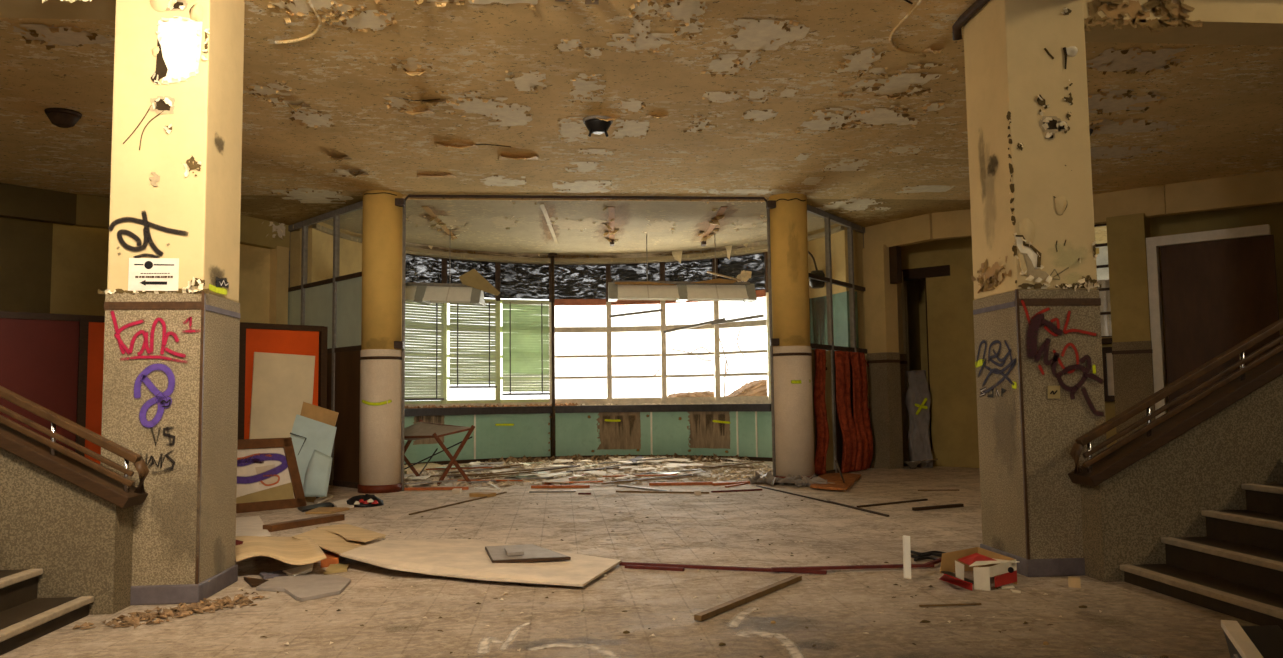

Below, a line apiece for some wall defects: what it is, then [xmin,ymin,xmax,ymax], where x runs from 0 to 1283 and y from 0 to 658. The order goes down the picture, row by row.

peeling [267,0,538,33]
peeling [1061,0,1203,32]
peeling [150,0,210,134]
peeling [382,70,547,129]
peeling [552,0,708,194]
peeling [683,19,810,133]
peeling [794,47,959,133]
peeling [1037,46,1186,140]
peeling [184,156,202,177]
peeling [271,156,369,204]
peeling [480,156,540,229]
peeling [971,111,1101,293]